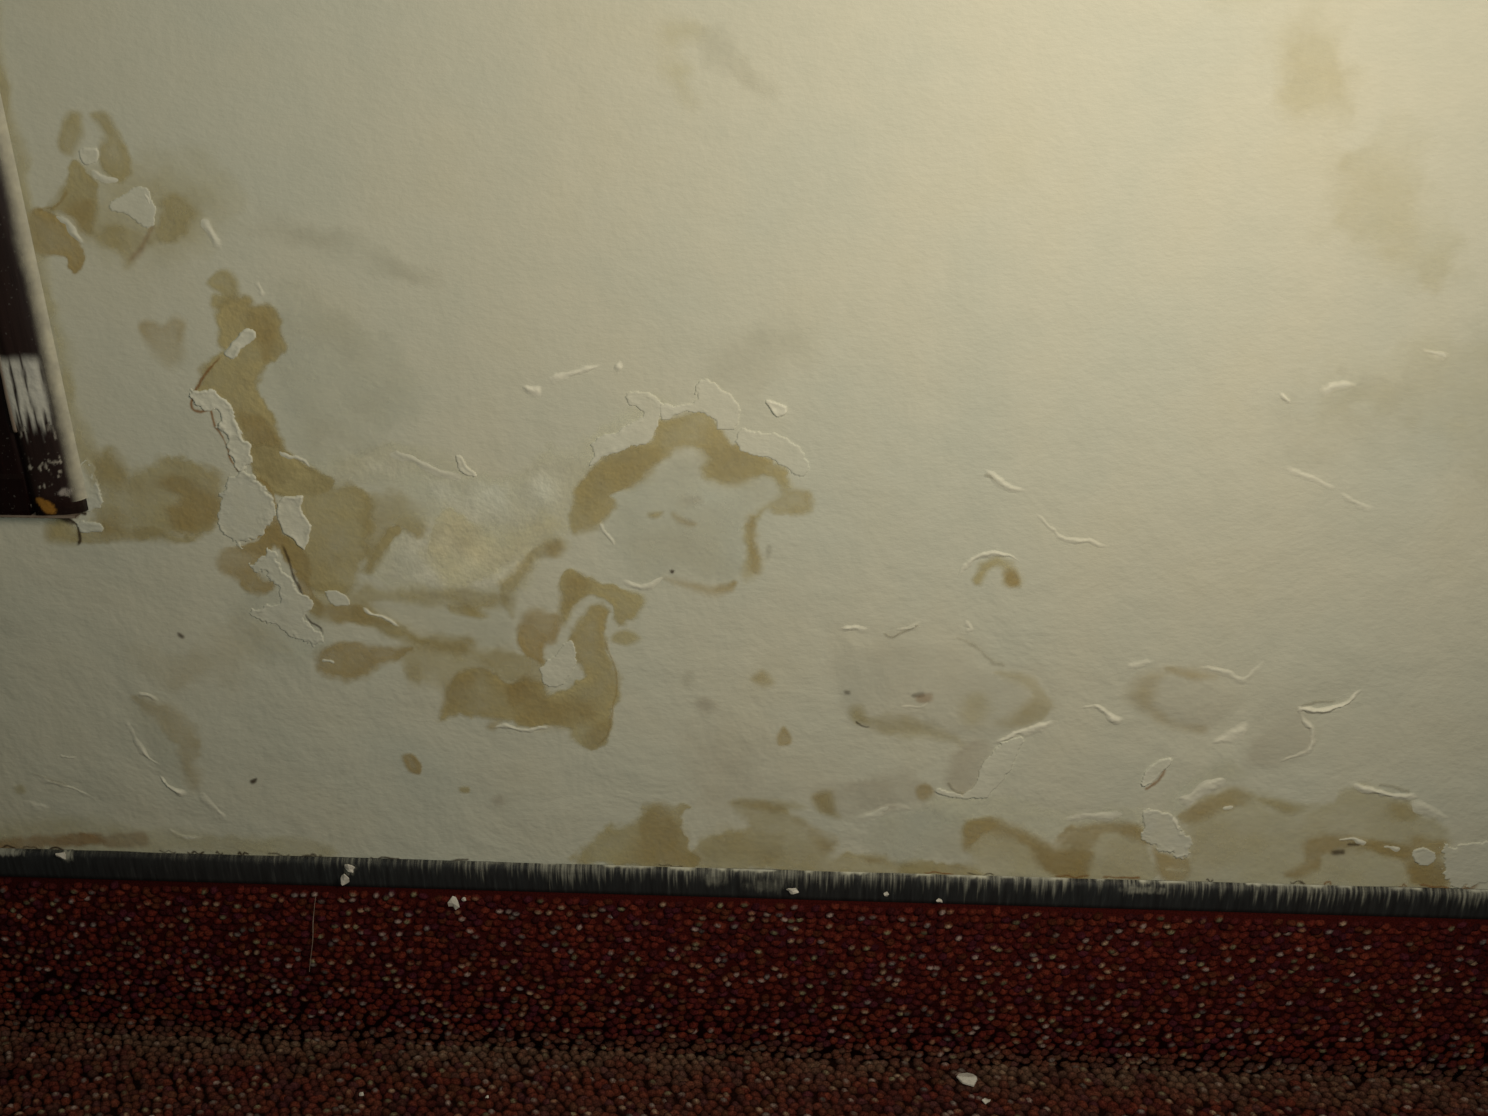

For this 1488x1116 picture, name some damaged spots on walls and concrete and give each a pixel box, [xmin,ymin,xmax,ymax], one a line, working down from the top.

leakage [21,115,168,273]
peeling [589,379,810,476]
leakage [78,272,426,677]
peeling [935,720,1059,799]
peeling [1278,688,1363,762]
peeling [1172,777,1228,832]
peeling [1347,781,1451,823]